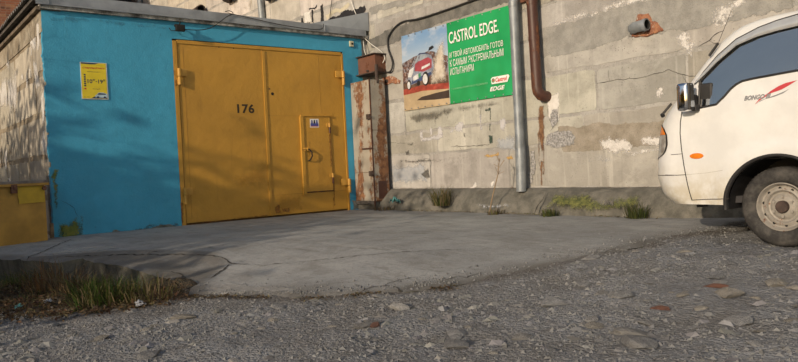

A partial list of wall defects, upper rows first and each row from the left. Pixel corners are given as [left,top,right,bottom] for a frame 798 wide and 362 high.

crack [601,69,688,83]